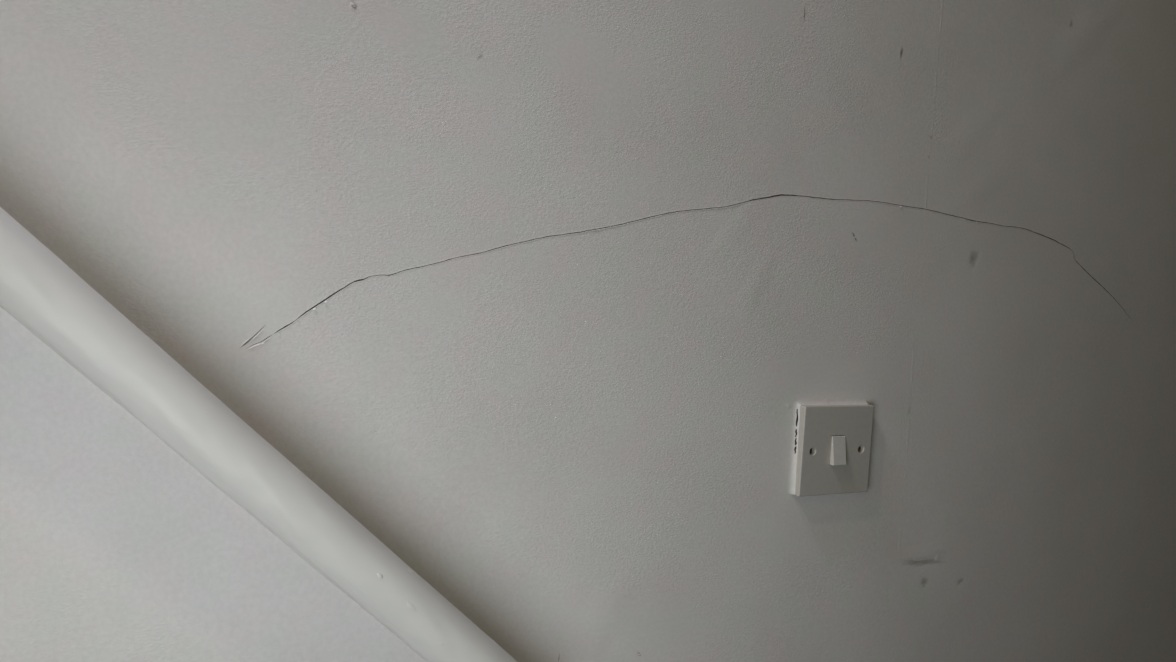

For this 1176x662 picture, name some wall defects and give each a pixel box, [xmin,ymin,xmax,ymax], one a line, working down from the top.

crack [241,193,1132,350]